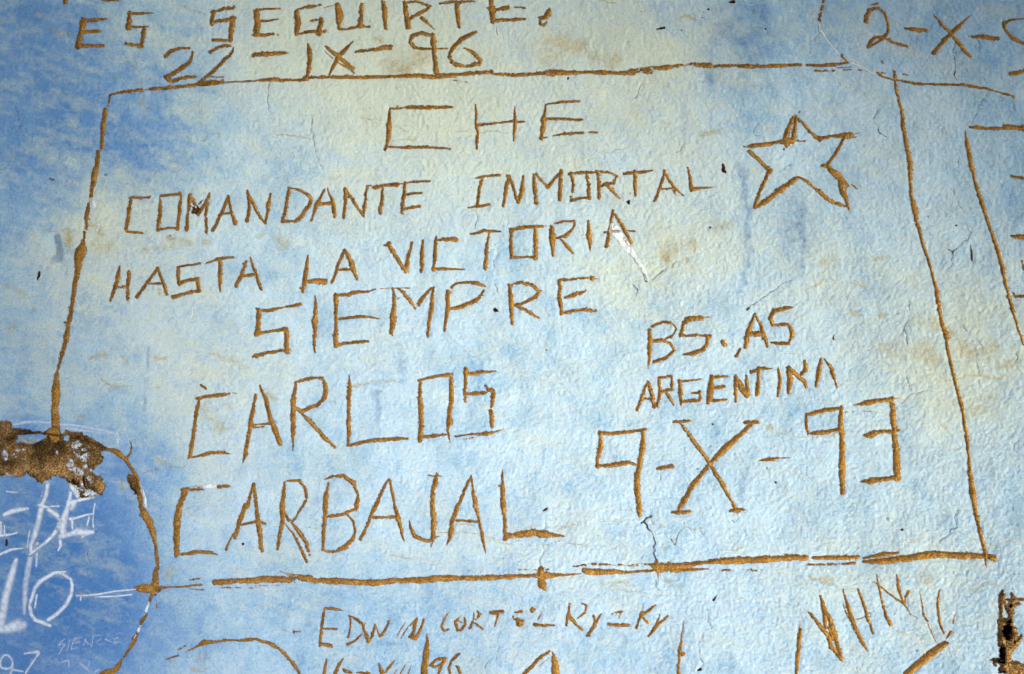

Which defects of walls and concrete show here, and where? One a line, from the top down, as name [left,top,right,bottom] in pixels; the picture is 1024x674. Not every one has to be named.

flaking render [0,420,106,500]
crack [641,508,704,591]
spalling [989,589,1024,674]